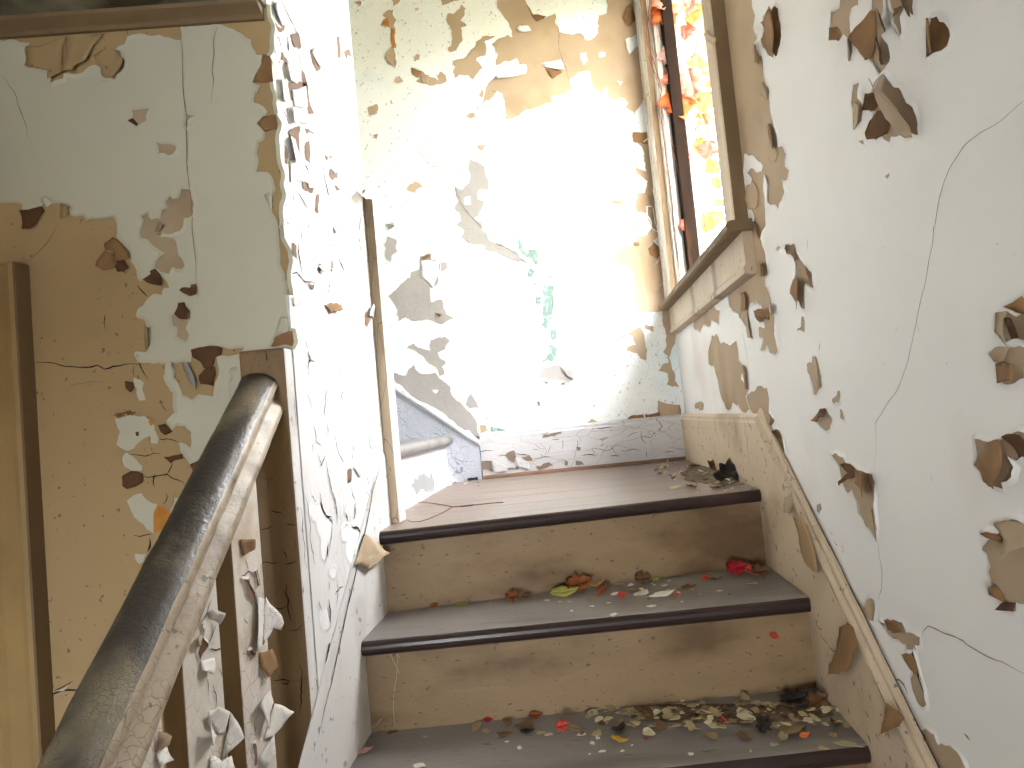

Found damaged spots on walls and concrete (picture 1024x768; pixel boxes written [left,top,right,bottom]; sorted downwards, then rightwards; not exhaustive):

crack [36,352,147,387]
peeling [0,186,248,730]
crack [132,438,189,504]
crack [180,33,198,292]
peeling [211,1,357,295]
peeling [387,252,594,482]
peeling [379,0,644,135]
peeling [693,0,817,456]
peeling [828,0,956,151]
crack [875,102,1022,428]
peeling [207,567,294,768]
crack [922,626,1024,674]